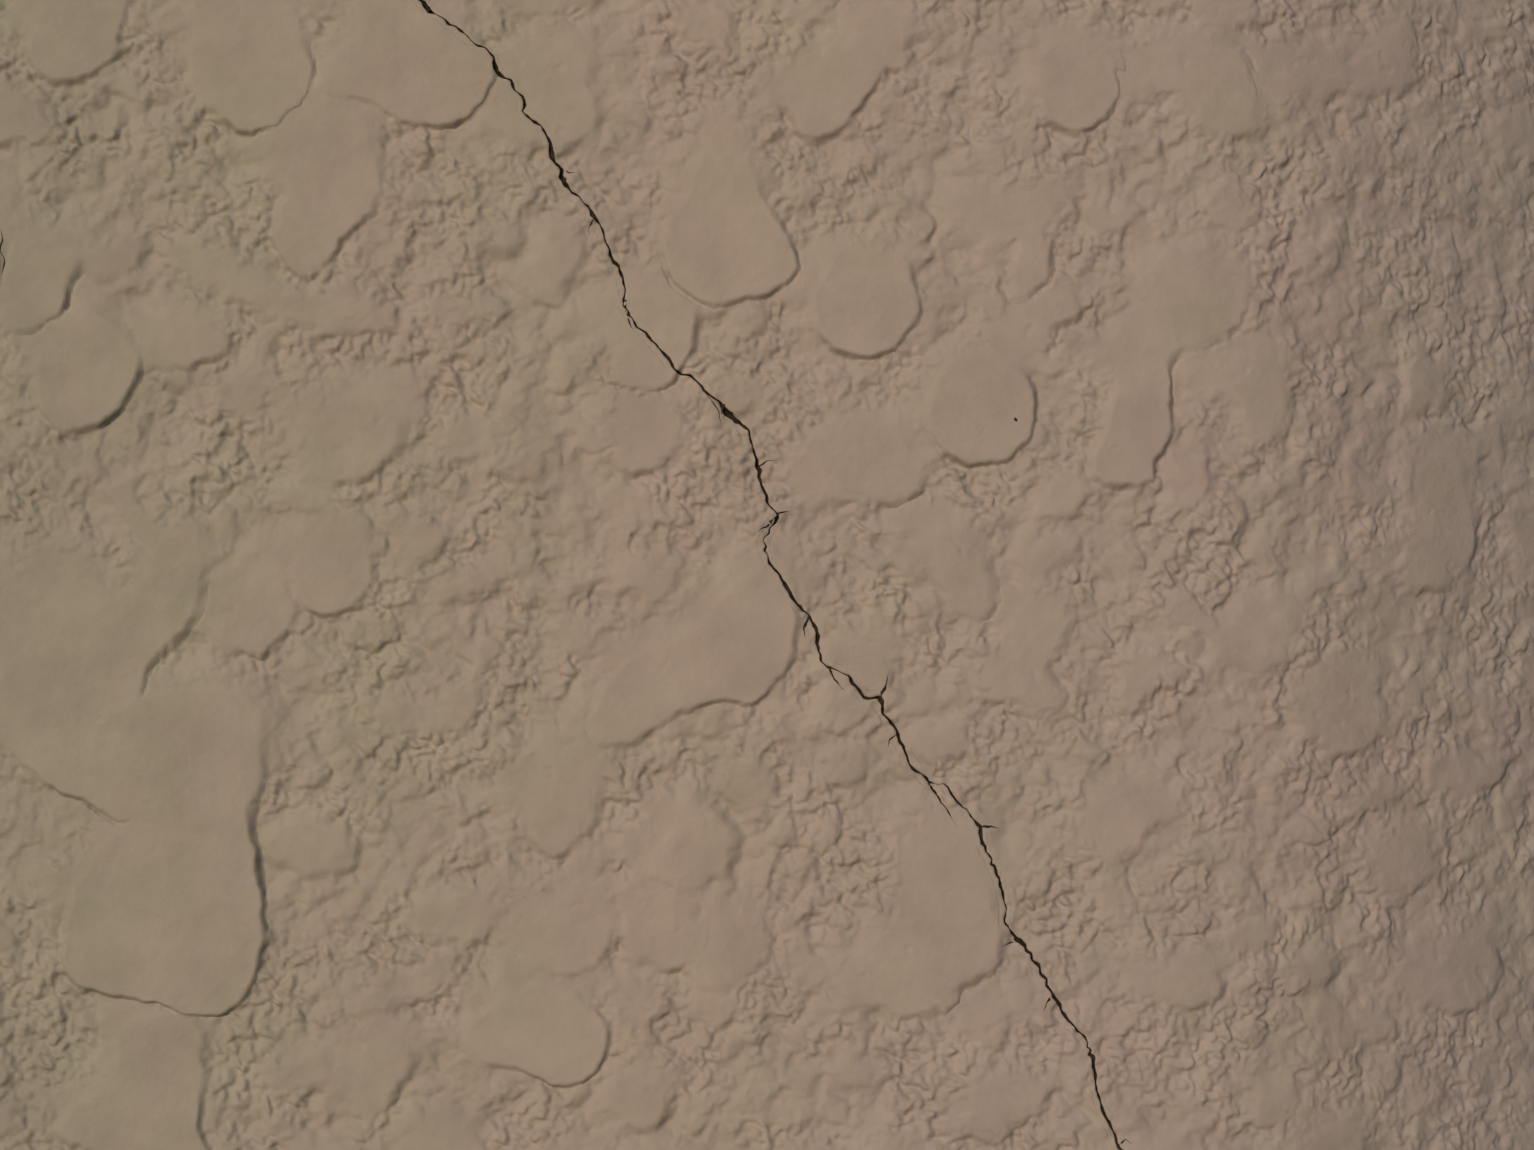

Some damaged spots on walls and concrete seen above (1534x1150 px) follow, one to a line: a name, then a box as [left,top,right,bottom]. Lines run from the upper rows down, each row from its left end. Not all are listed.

crack [412,0,1131,1150]